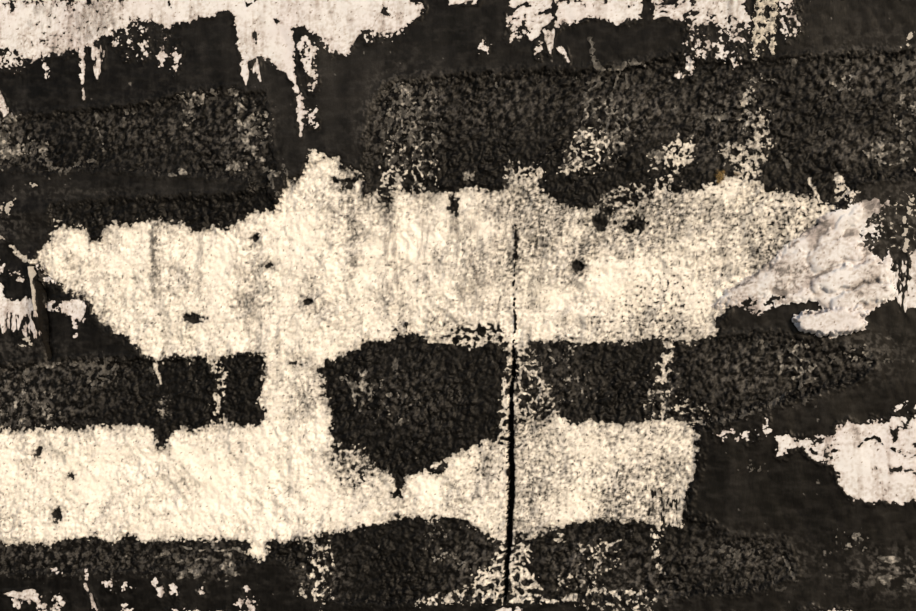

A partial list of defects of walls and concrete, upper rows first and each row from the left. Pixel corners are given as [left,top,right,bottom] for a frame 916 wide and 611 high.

peeling [0,0,424,137]
peeling [506,0,643,63]
peeling [691,39,707,59]
peeling [651,0,752,46]
peeling [779,0,801,40]
peeling [0,266,42,346]
crack [503,224,518,601]
peeling [716,428,750,442]
peeling [775,400,916,506]